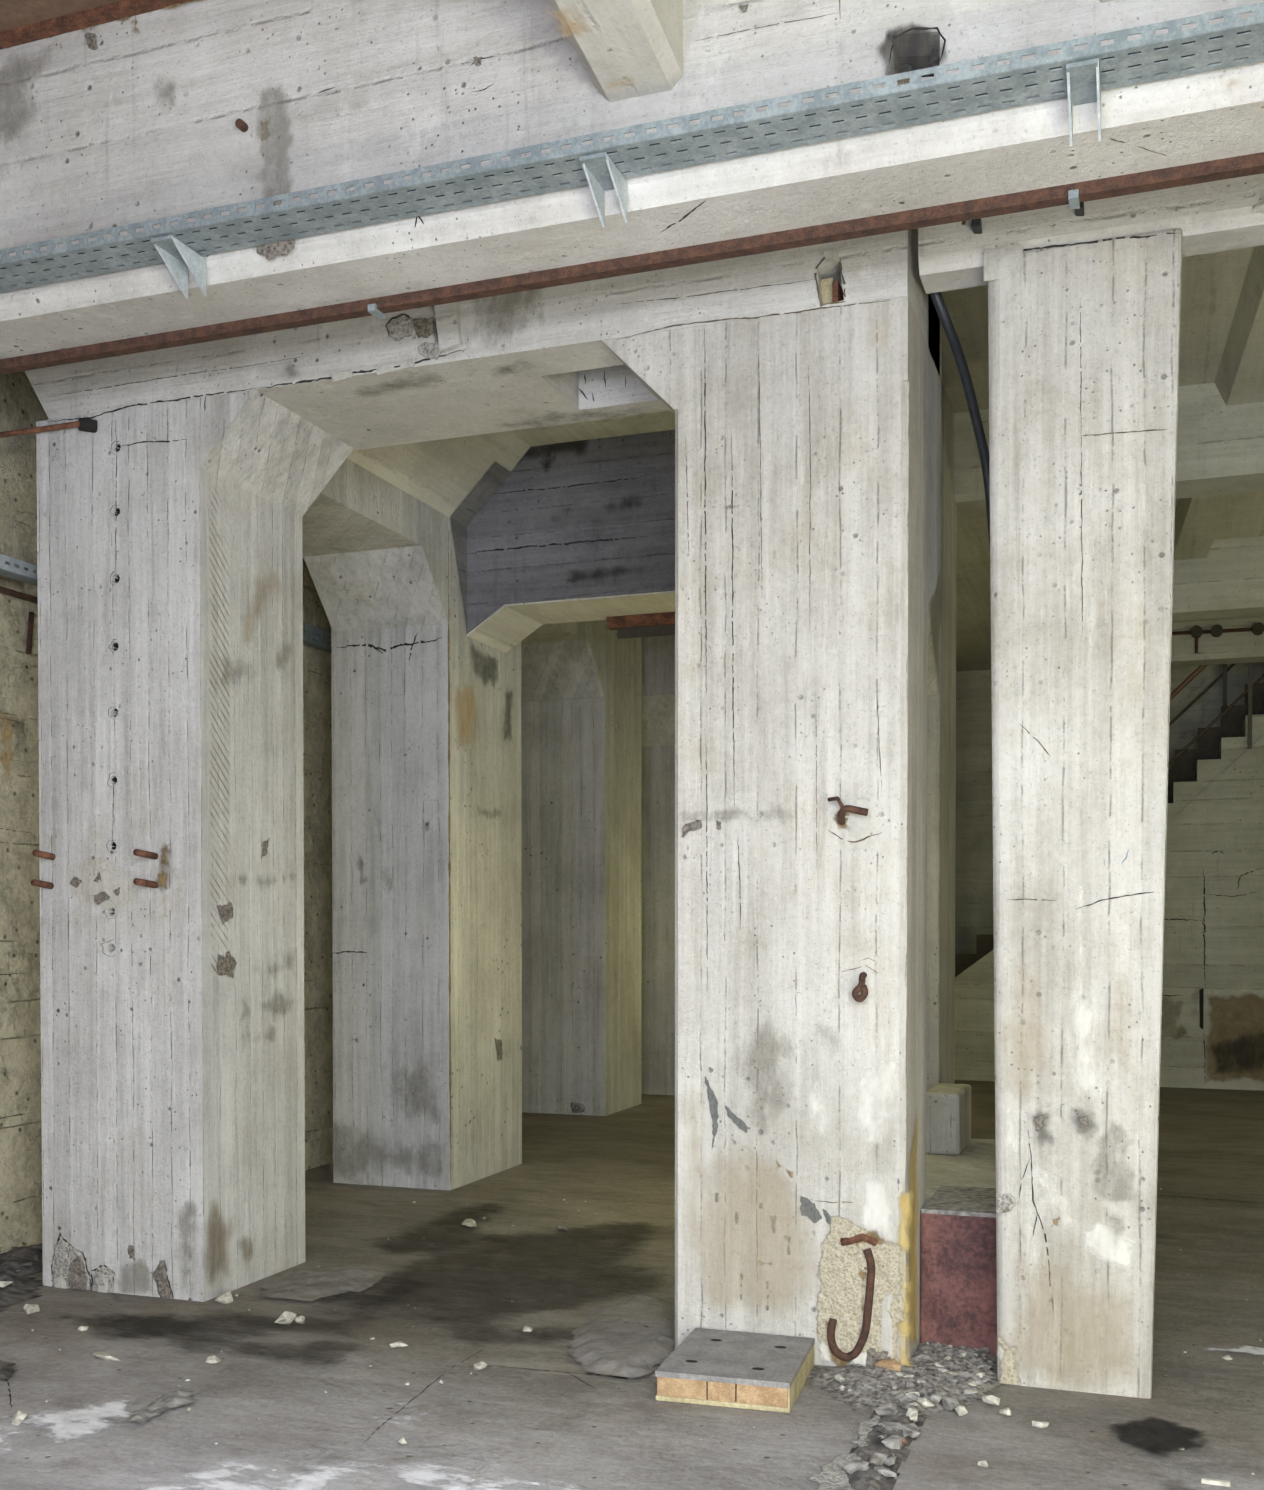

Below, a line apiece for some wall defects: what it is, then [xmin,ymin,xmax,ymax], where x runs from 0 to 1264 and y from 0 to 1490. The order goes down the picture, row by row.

corrosion [158,846,168,888]
leakage [1207,994,1264,1081]
spalling [51,1235,115,1293]
spalling [153,1261,173,1298]
leakage [211,1213,224,1271]
leakage [322,1205,652,1341]
spalling [817,1209,904,1368]
leakage [111,1314,347,1334]
leakage [0,1400,130,1452]
leakage [147,1461,368,1490]
leakage [396,1464,541,1490]